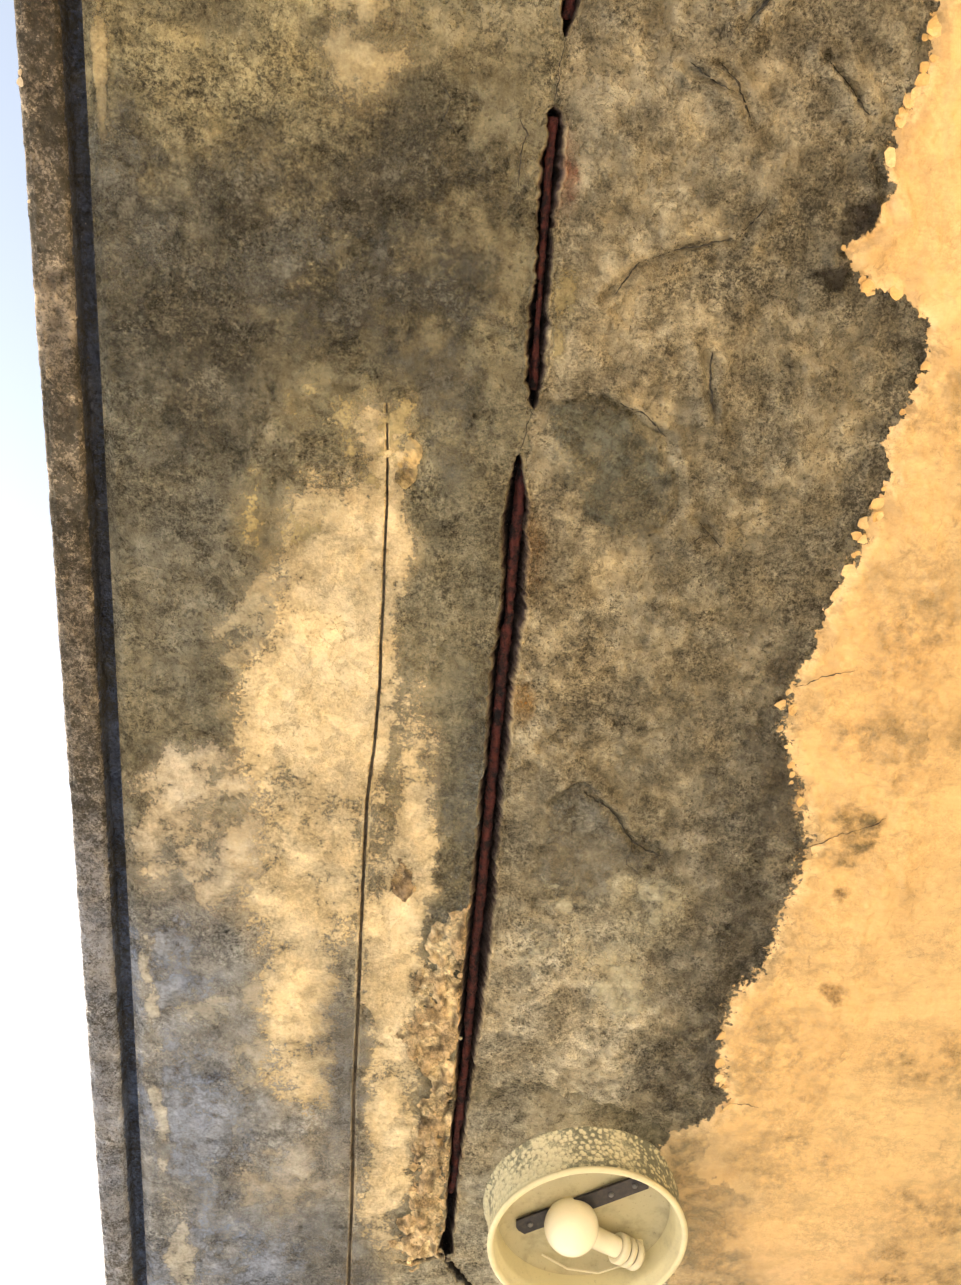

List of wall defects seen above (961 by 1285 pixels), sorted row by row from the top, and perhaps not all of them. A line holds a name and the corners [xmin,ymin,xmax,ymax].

peeling [89,0,108,138]
peeling [317,0,414,108]
water stain [88,78,530,487]
water stain [129,907,381,1285]
peeling [126,380,468,1285]
crack [345,402,391,1285]
crack [394,0,585,1285]
water stain [517,876,574,976]
water stain [570,940,650,1017]
crack [583,790,665,872]
water stain [637,878,687,936]
flaking render [475,0,942,1134]